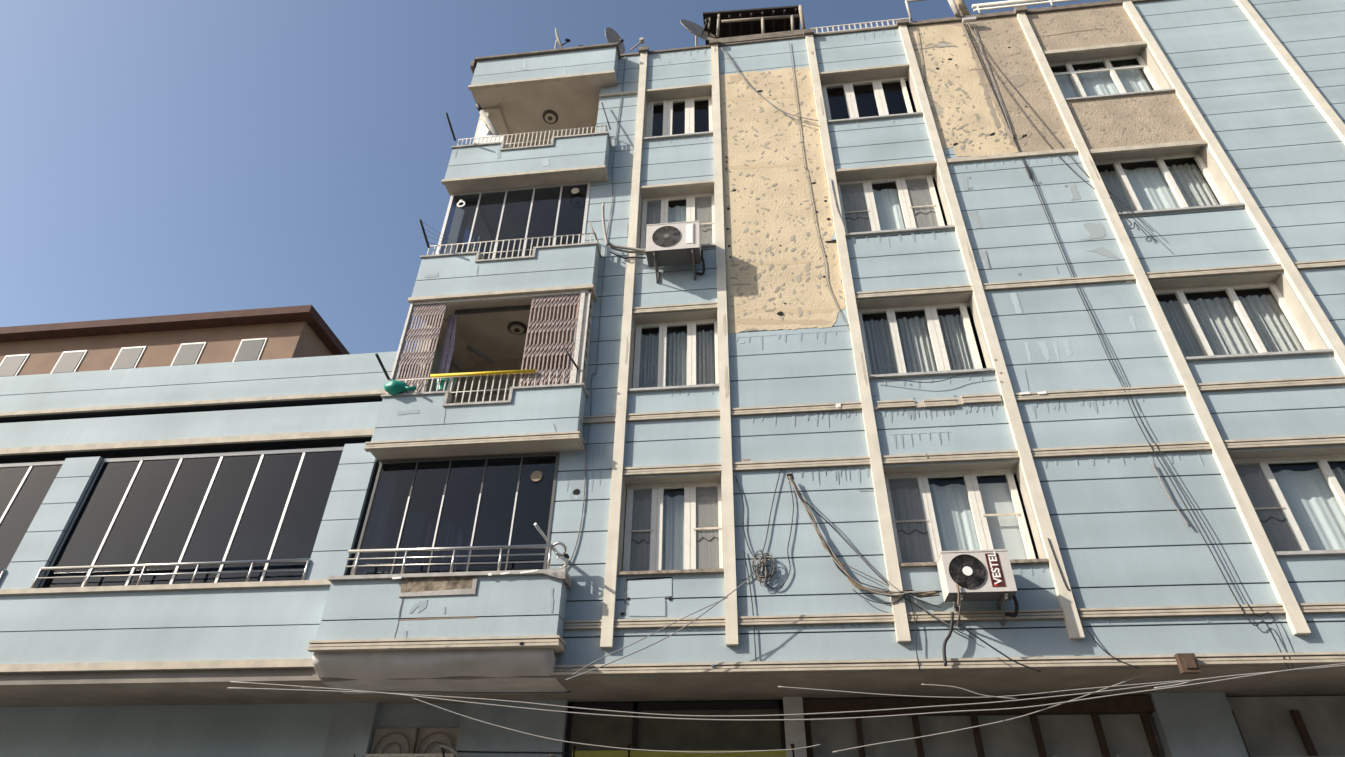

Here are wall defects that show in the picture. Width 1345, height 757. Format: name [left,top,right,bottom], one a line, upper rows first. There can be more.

spalling [952,126,1027,146]